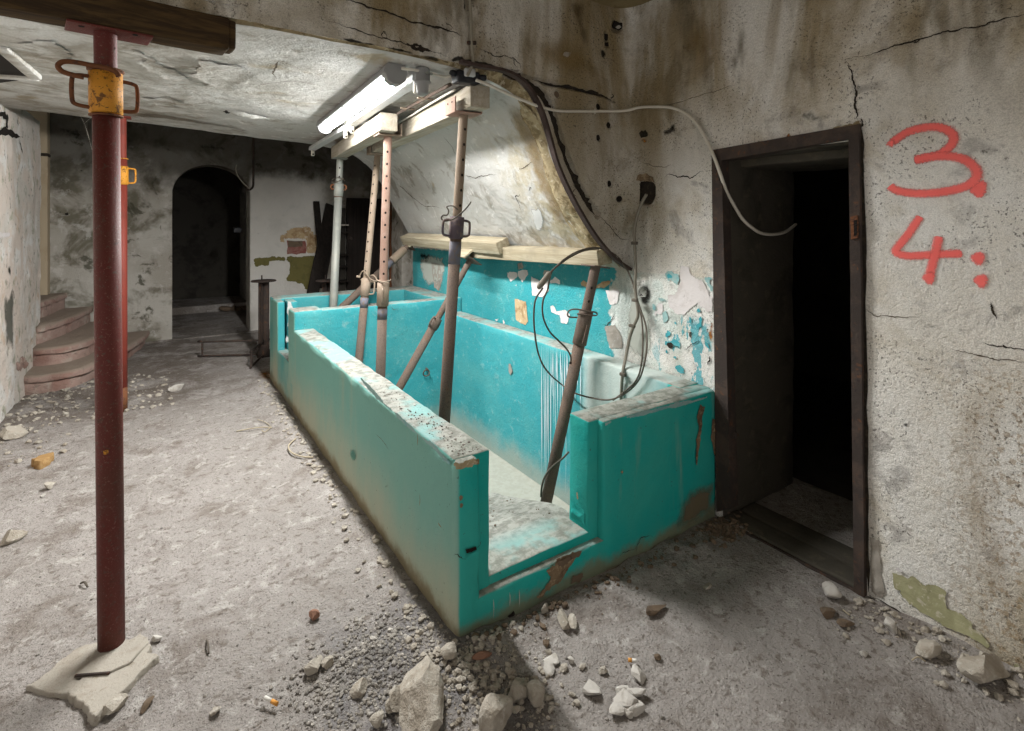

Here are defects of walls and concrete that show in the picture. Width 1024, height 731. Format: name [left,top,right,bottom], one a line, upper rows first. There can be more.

crack [334,0,459,59]
crack [481,49,629,240]
peeling [254,226,317,290]
flaking render [652,266,713,374]
crack [845,15,1023,613]
spalling [537,551,584,598]
peeling [869,537,990,648]